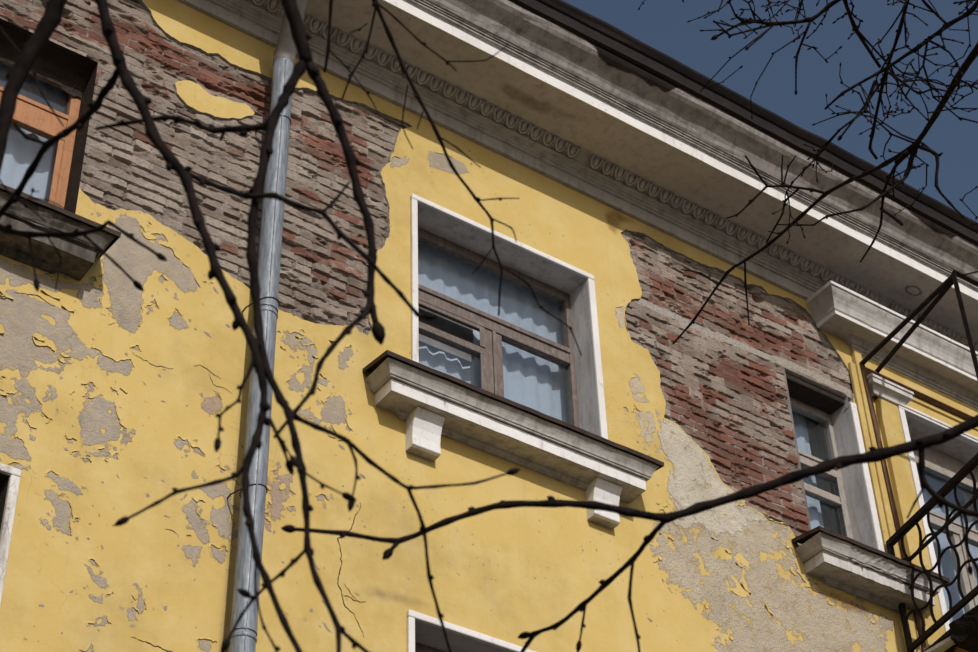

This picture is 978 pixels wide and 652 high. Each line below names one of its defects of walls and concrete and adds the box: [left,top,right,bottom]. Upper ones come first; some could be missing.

flaking render [0,0,272,471]
flaking render [276,87,412,456]
flaking render [615,229,894,652]
peeling [39,469,86,543]
peeling [177,463,240,567]
peeling [264,462,296,534]
peeling [69,557,114,603]
peeling [120,583,147,627]